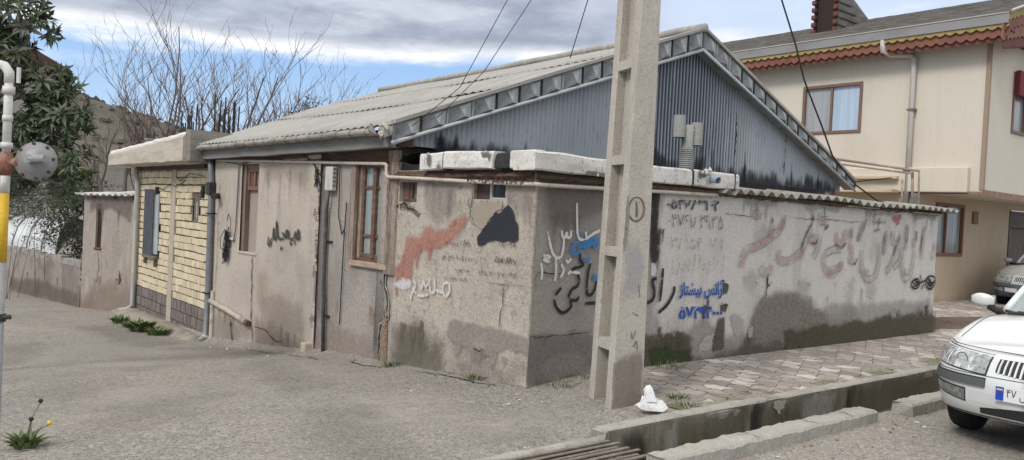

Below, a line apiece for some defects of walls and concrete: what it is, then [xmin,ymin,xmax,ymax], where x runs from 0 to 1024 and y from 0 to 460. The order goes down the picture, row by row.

crack [487,271,567,328]
water stain [699,292,929,352]
water stain [447,320,593,385]